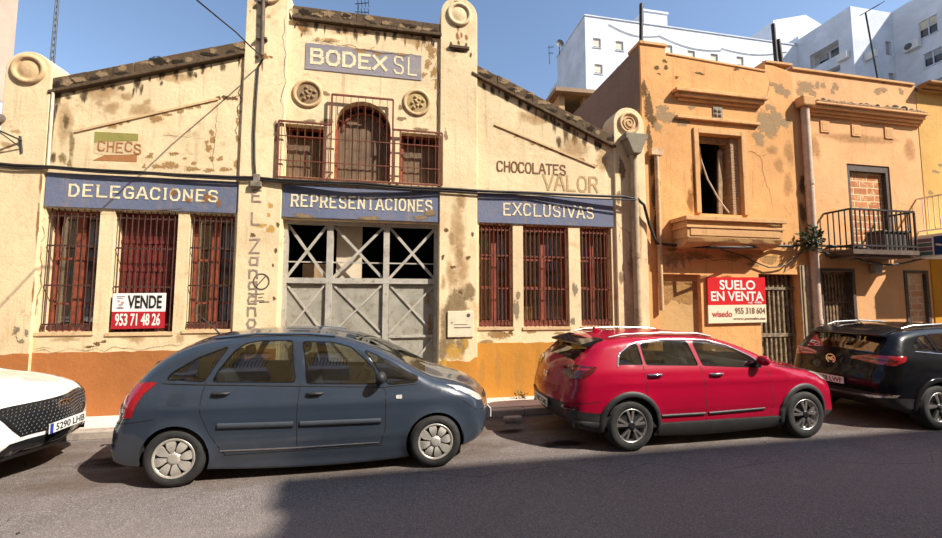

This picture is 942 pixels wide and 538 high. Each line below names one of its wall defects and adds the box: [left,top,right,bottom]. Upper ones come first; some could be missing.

water stain [294,23,435,46]
water stain [50,63,225,167]
water stain [482,83,606,168]
spalling [641,78,696,238]
peeling [752,104,792,151]
peeling [770,81,839,98]
peeling [439,283,475,360]
peeling [480,330,514,344]